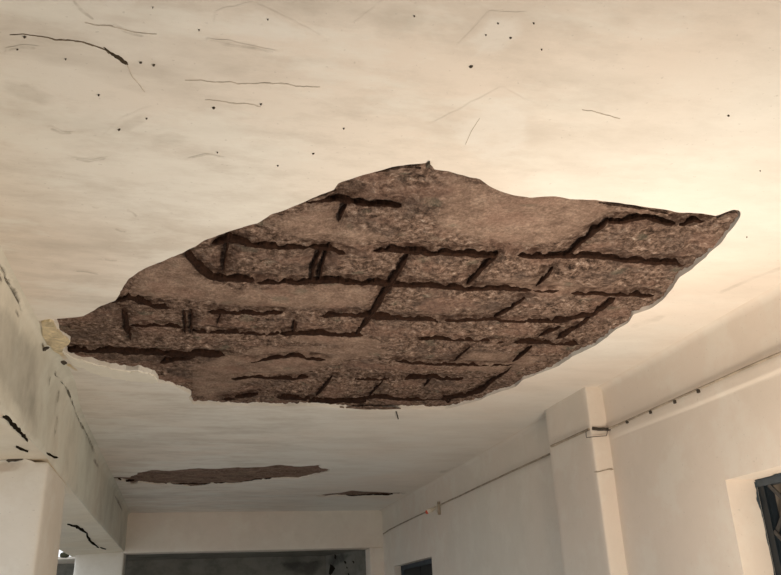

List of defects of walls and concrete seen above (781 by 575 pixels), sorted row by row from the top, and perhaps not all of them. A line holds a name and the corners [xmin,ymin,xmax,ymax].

crack [10,22,157,92]
crack [185,80,319,107]
spalling [41,161,738,410]
crack [0,415,28,462]
spalling [114,465,328,486]
crack [67,524,106,550]